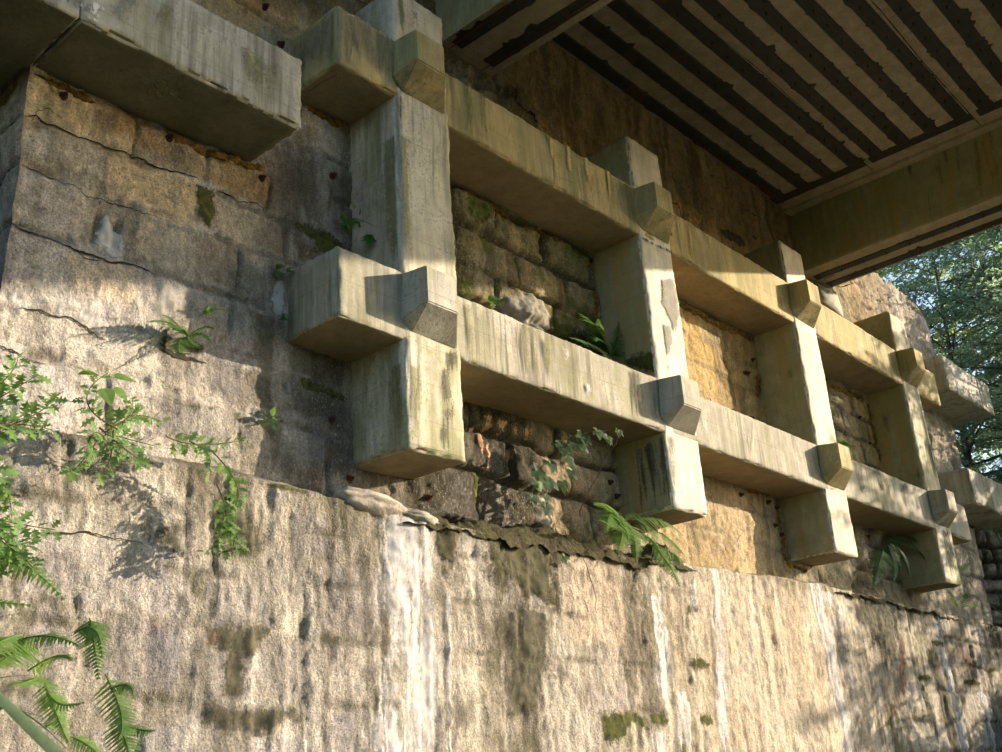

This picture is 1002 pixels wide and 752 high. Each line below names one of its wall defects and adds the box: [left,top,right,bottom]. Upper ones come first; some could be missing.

crack [0,108,265,216]
crack [0,223,153,274]
crack [19,307,106,340]
crack [38,531,146,547]
damp [374,515,462,752]
damp [476,530,573,725]
damp [651,595,691,752]
damp [709,568,729,752]
damp [810,583,863,752]
damp [854,600,899,669]
damp [921,621,967,752]
damp [977,691,996,752]